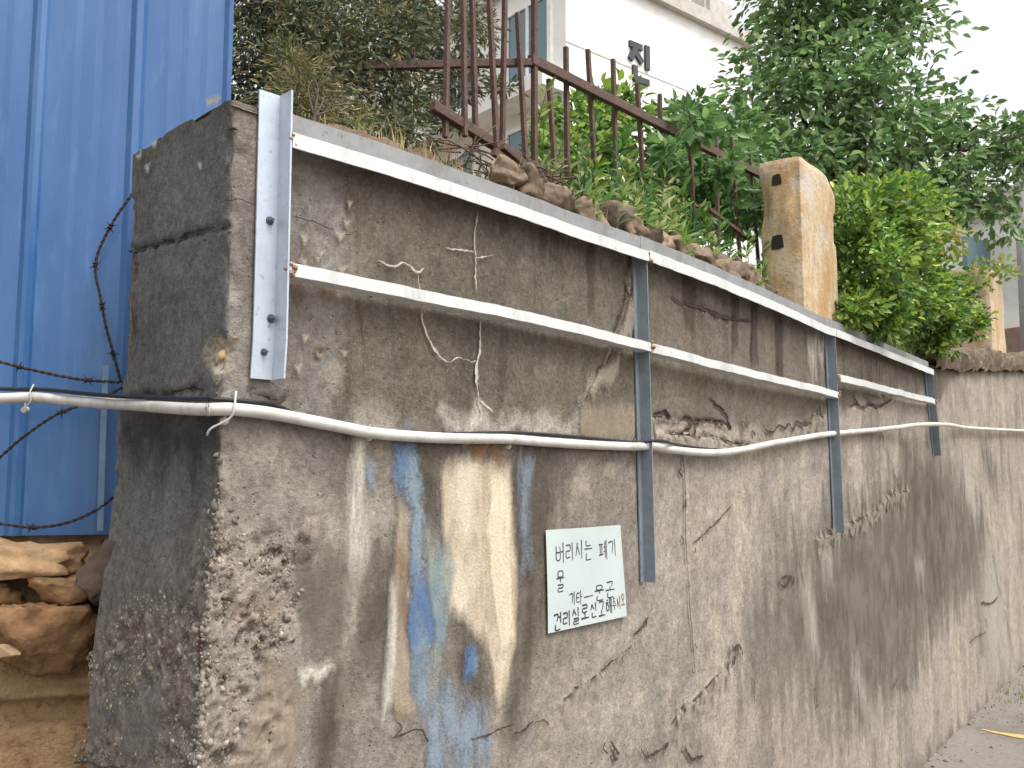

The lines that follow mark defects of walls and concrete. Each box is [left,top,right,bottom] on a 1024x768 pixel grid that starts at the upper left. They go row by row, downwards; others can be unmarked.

crack [128,226,232,255]
crack [380,261,493,413]
crack [447,211,491,290]
spalling [584,346,620,398]
crack [579,256,633,406]
spalling [621,303,635,337]
crack [671,296,780,371]
spalling [74,452,331,768]
water stain [516,471,549,661]
crack [563,617,649,704]
crack [603,394,910,767]
water stain [823,444,982,719]